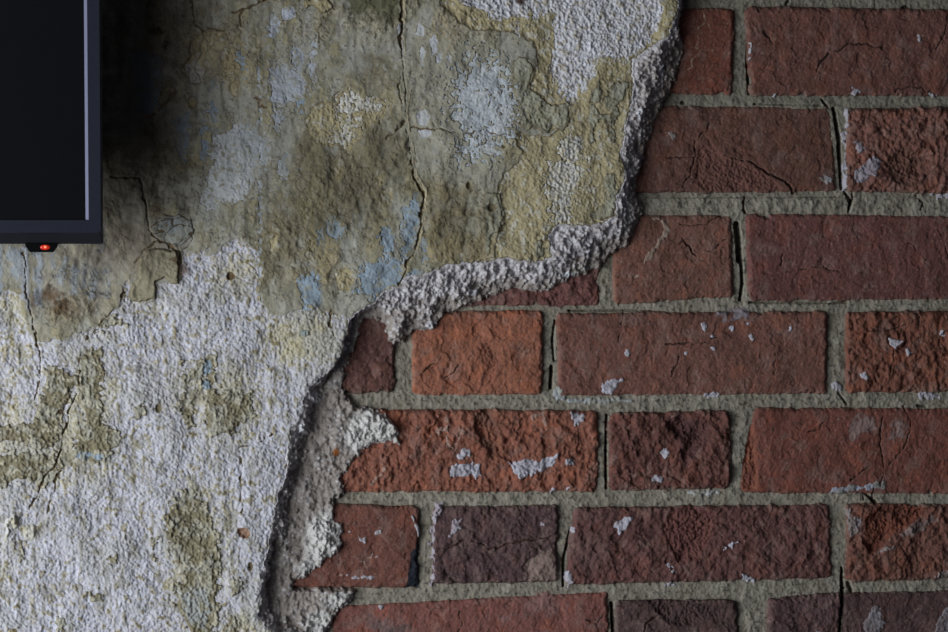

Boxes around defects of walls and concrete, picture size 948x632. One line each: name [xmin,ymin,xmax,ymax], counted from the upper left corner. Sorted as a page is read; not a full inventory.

damp [349,0,399,23]
crack [386,0,511,285]
crack [21,252,41,400]
damp [0,244,110,310]
crack [18,291,126,519]
peeling [0,0,684,632]